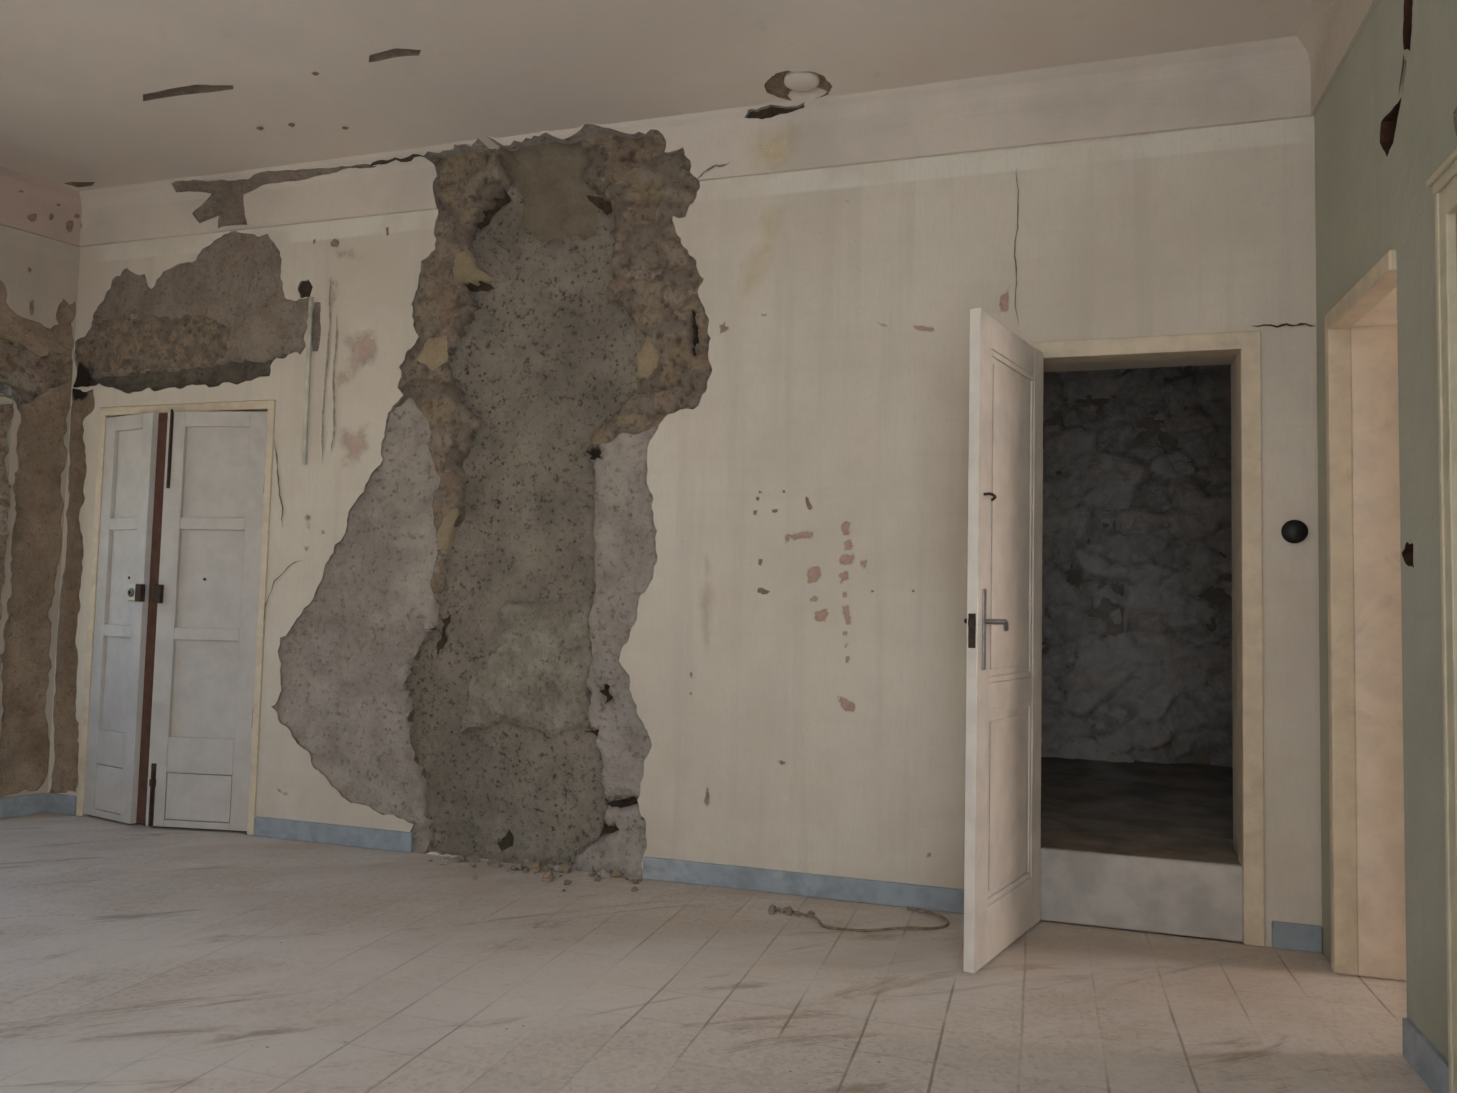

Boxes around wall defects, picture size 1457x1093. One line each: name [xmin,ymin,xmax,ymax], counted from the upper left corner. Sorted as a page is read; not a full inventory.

flaking render [0,232,313,798]
flaking render [273,135,728,878]
peeling [785,532,813,541]
peeling [807,521,866,635]
peeling [839,697,855,711]